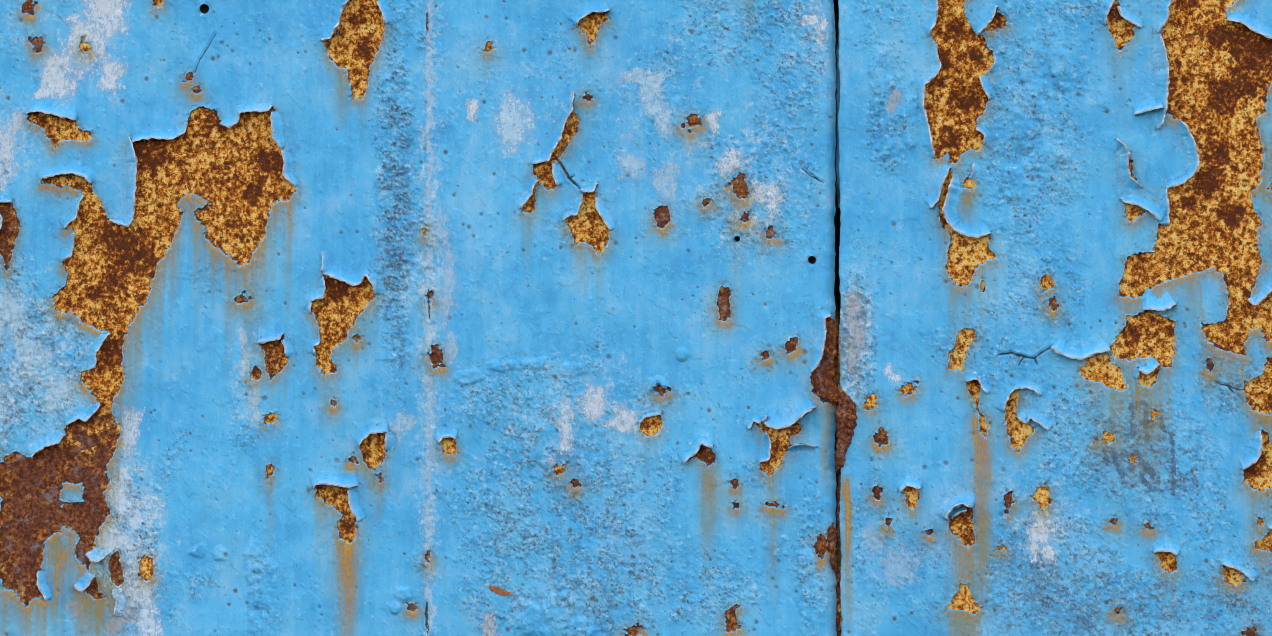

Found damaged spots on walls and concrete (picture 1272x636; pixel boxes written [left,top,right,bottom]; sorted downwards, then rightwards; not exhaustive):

peeling [321,0,394,103]
peeling [0,97,298,624]
peeling [250,251,386,384]
peeling [310,416,396,629]
peeling [515,93,580,214]
peeling [559,180,616,260]
peeling [742,310,840,480]
peeling [894,473,923,516]
peeling [914,0,1008,292]
peeling [933,328,1054,619]
peeling [1051,0,1272,496]